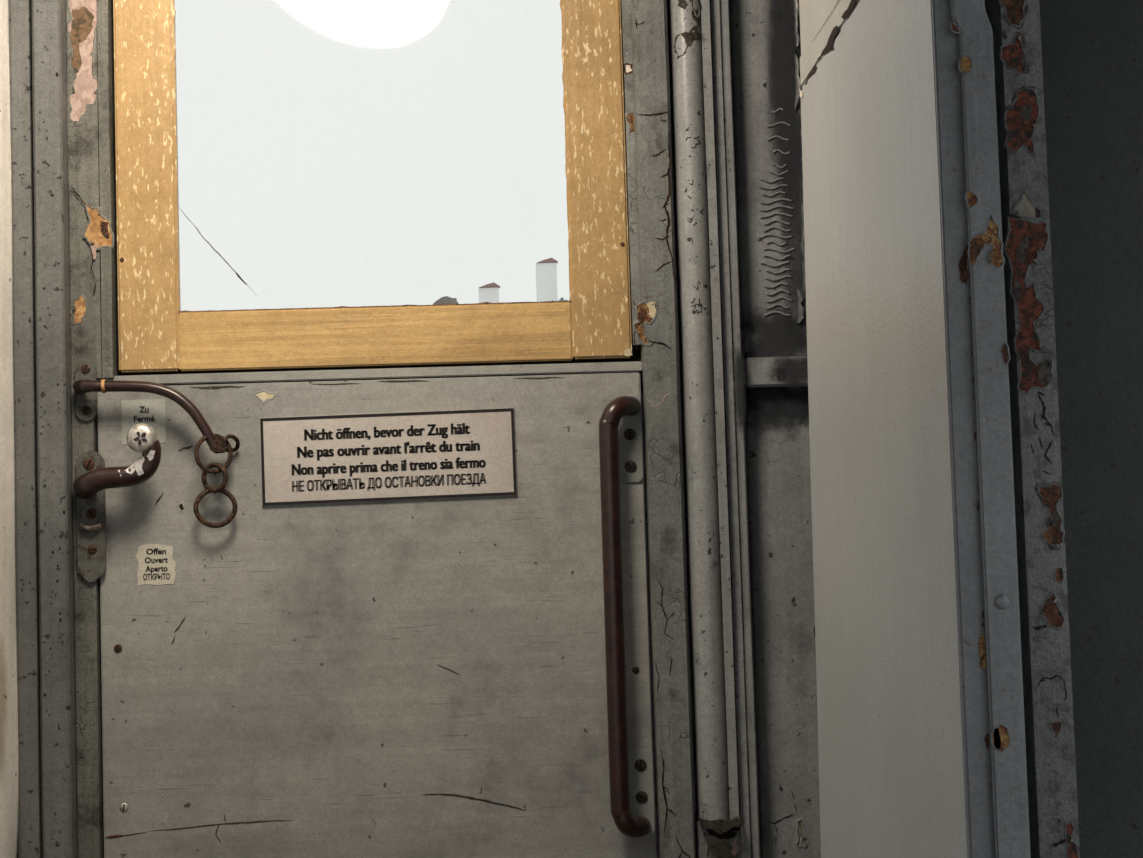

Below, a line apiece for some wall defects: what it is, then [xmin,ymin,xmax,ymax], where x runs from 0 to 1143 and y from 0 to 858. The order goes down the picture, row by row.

peeling [67,0,98,125]
corrosion [999,0,1040,157]
peeling [83,204,114,259]
crack [637,112,708,313]
damp [734,0,809,430]
corrosion [956,215,1053,395]
corrosion [1035,481,1066,551]
corrosion [1033,566,1066,631]
corrosion [1052,813,1080,858]